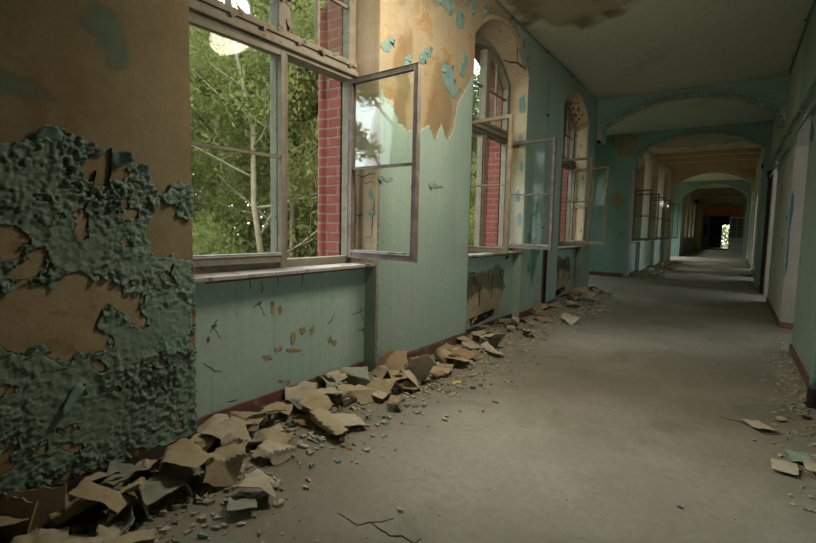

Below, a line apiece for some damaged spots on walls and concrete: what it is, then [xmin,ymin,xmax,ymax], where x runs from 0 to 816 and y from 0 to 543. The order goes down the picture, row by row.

crack [83,148,113,211]
peeling [356,60,505,366]
peeling [0,124,199,494]
peeling [263,326,314,361]
crack [338,513,421,543]